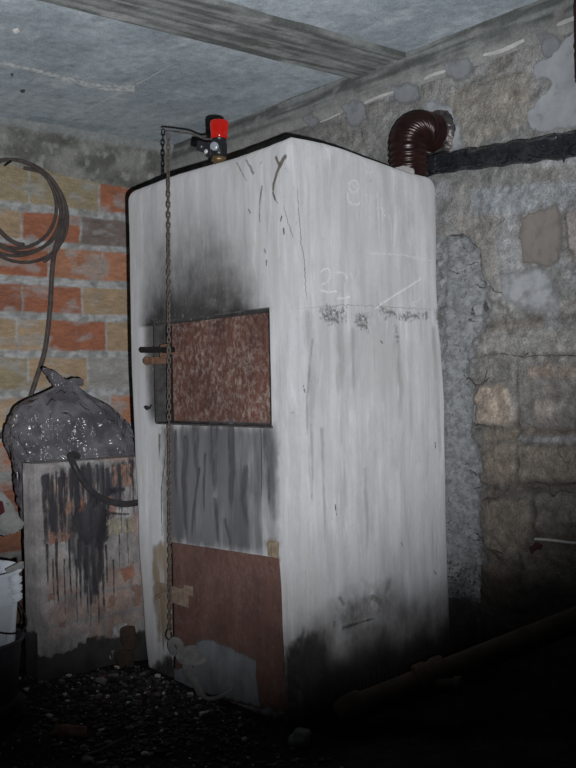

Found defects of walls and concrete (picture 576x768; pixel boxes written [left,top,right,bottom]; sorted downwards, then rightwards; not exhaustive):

crack [449,234,502,294]
crack [464,352,576,391]
damp [174,426,217,532]
damp [228,420,246,514]
crack [465,463,576,505]
damp [41,460,134,615]